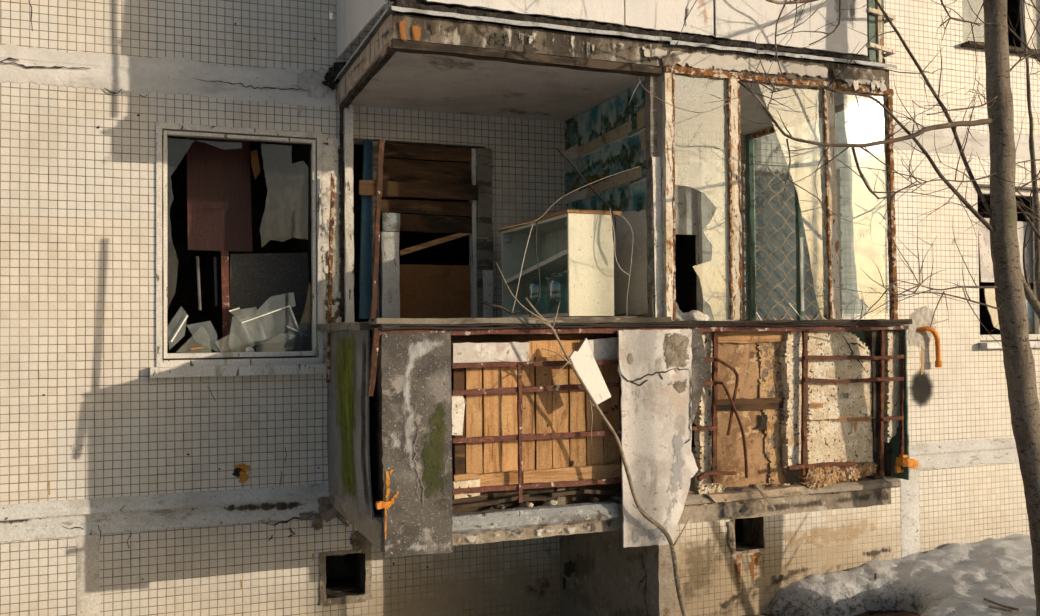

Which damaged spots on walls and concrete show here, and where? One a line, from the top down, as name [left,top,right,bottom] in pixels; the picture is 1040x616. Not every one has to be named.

crack [0,57,147,98]
crack [193,78,310,91]
peeling [663,333,690,393]
damp [335,338,369,504]
damp [391,339,442,468]
crack [619,365,692,444]
spalling [299,496,372,554]
corrosion [734,553,764,587]